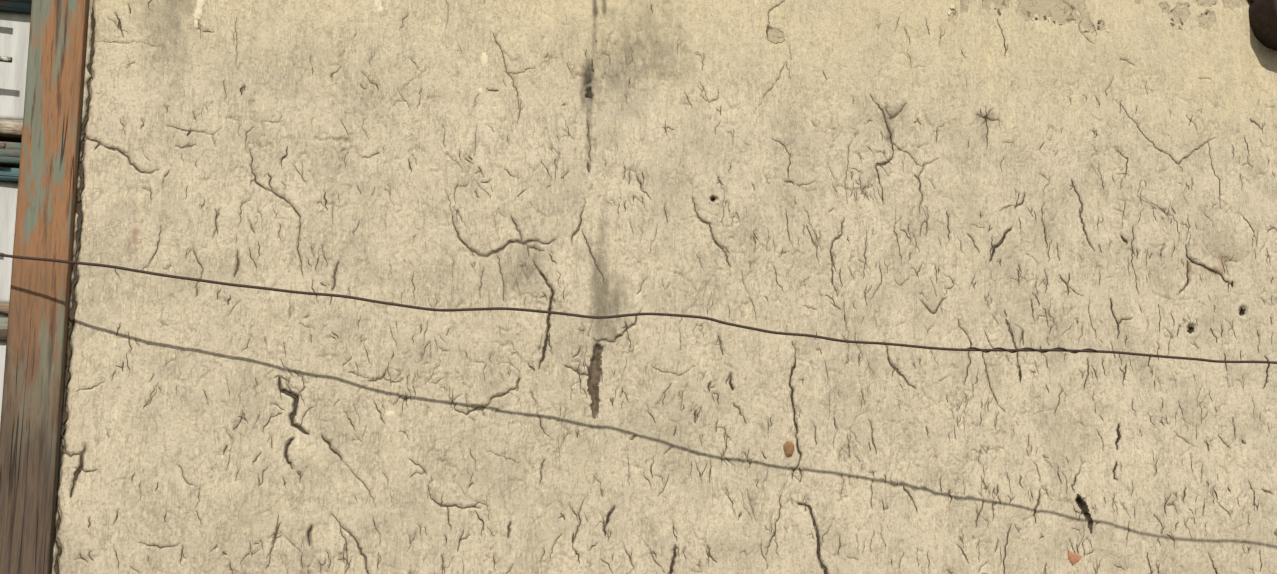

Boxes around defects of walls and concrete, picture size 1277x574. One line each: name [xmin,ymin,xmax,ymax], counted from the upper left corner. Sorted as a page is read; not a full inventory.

crack [54,0,395,574]
crack [203,30,1277,574]
crack [878,18,967,86]